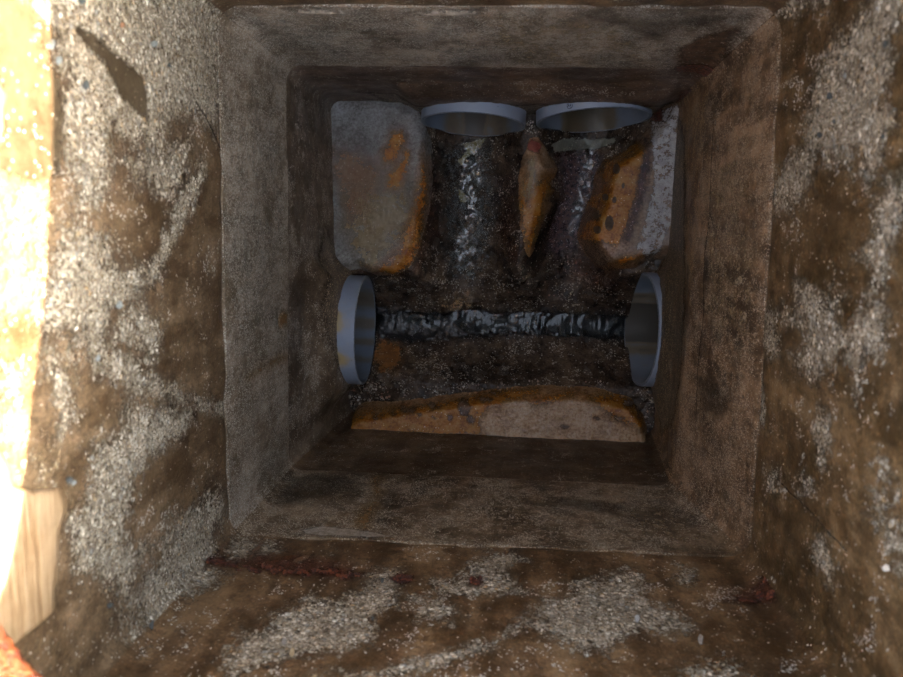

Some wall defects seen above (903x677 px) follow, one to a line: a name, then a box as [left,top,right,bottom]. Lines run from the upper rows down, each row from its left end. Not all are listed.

water stain [76,26,150,124]
water stain [0,0,65,324]
rust [371,129,430,276]
water stain [412,144,525,282]
rust [519,173,553,251]
water stain [542,150,618,290]
rust [577,142,645,266]
water stain [375,297,629,344]
water stain [0,427,62,490]
rust [351,385,645,435]
rust [206,542,364,580]